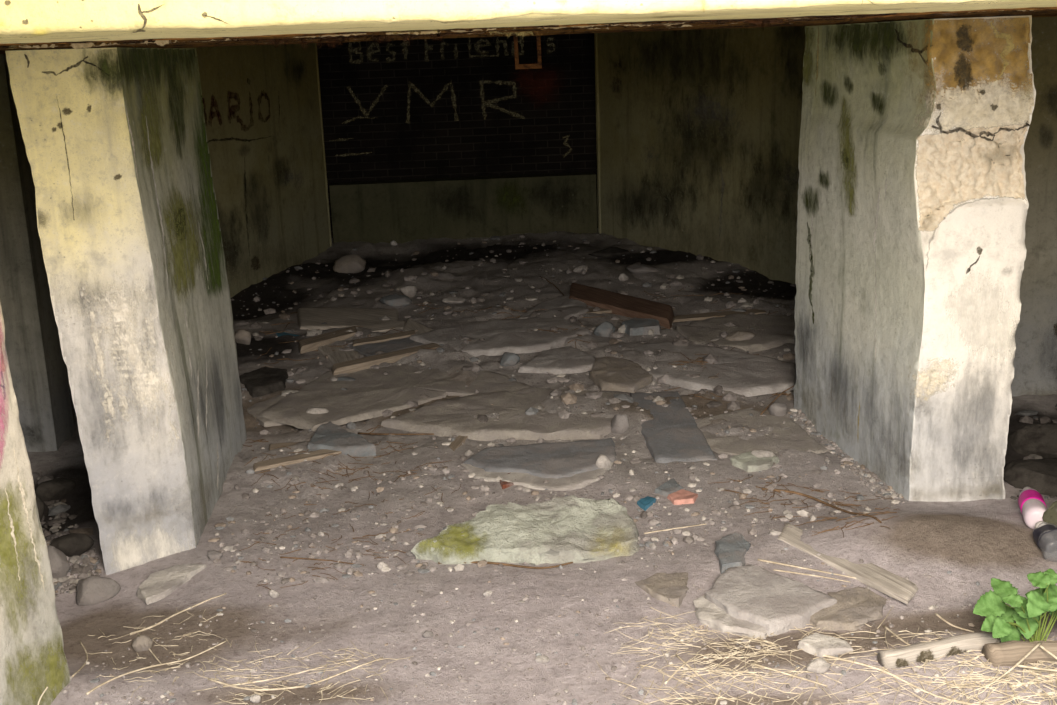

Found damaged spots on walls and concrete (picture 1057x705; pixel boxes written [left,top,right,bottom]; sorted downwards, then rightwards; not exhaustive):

crack [24,54,109,218]
spalling [915,10,1034,231]
crack [931,112,1030,141]